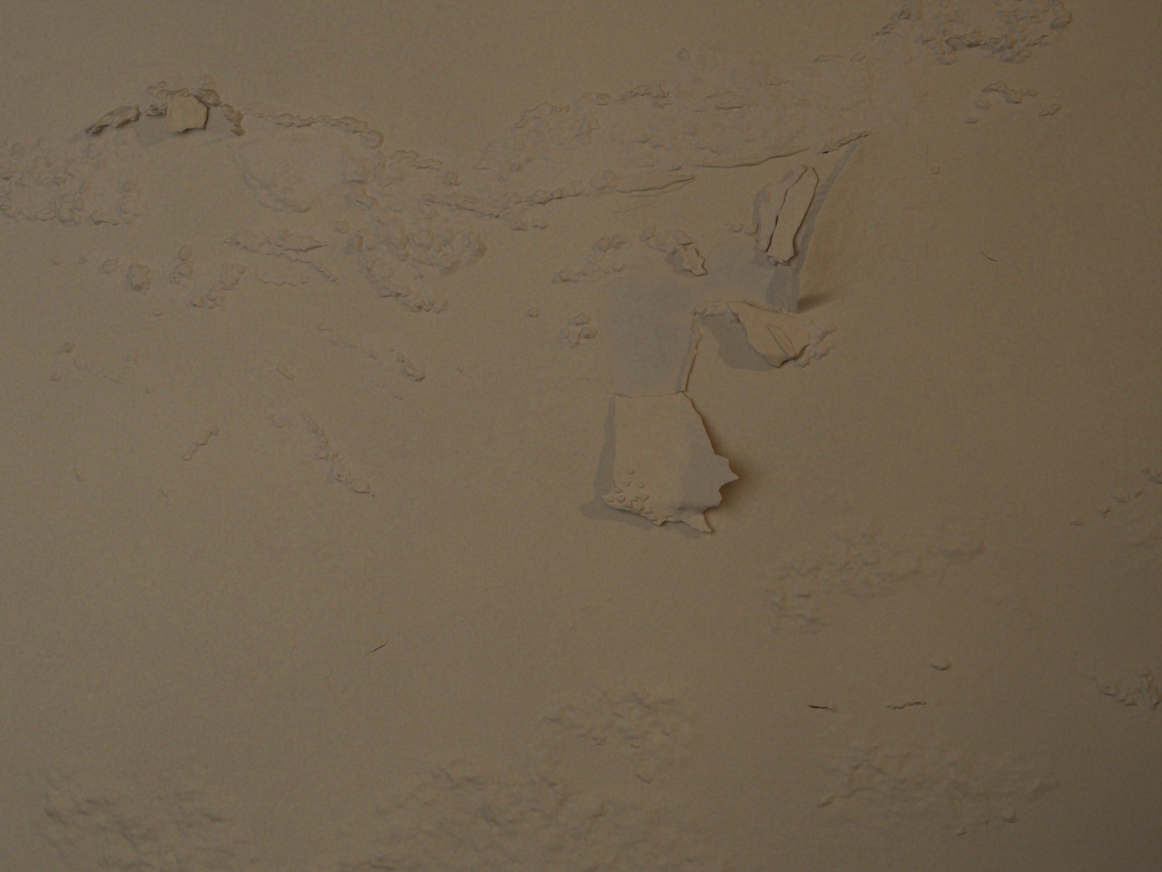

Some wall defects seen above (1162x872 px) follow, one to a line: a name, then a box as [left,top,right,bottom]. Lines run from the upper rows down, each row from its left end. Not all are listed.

flaking render [85,73,391,188]
peeling [694,293,837,368]
peeling [601,392,740,533]